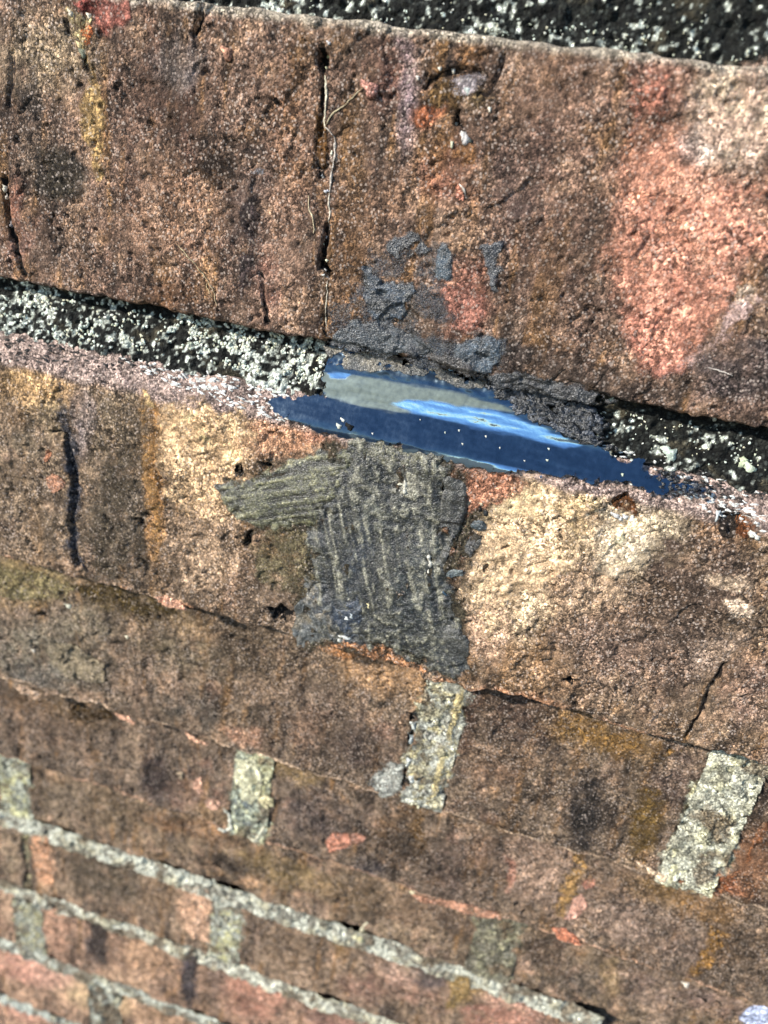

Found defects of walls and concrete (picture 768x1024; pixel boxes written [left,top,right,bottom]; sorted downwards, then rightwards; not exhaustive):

crack [308,40,362,344]
crack [359,349,487,377]
crack [52,382,88,571]
crack [685,663,724,735]